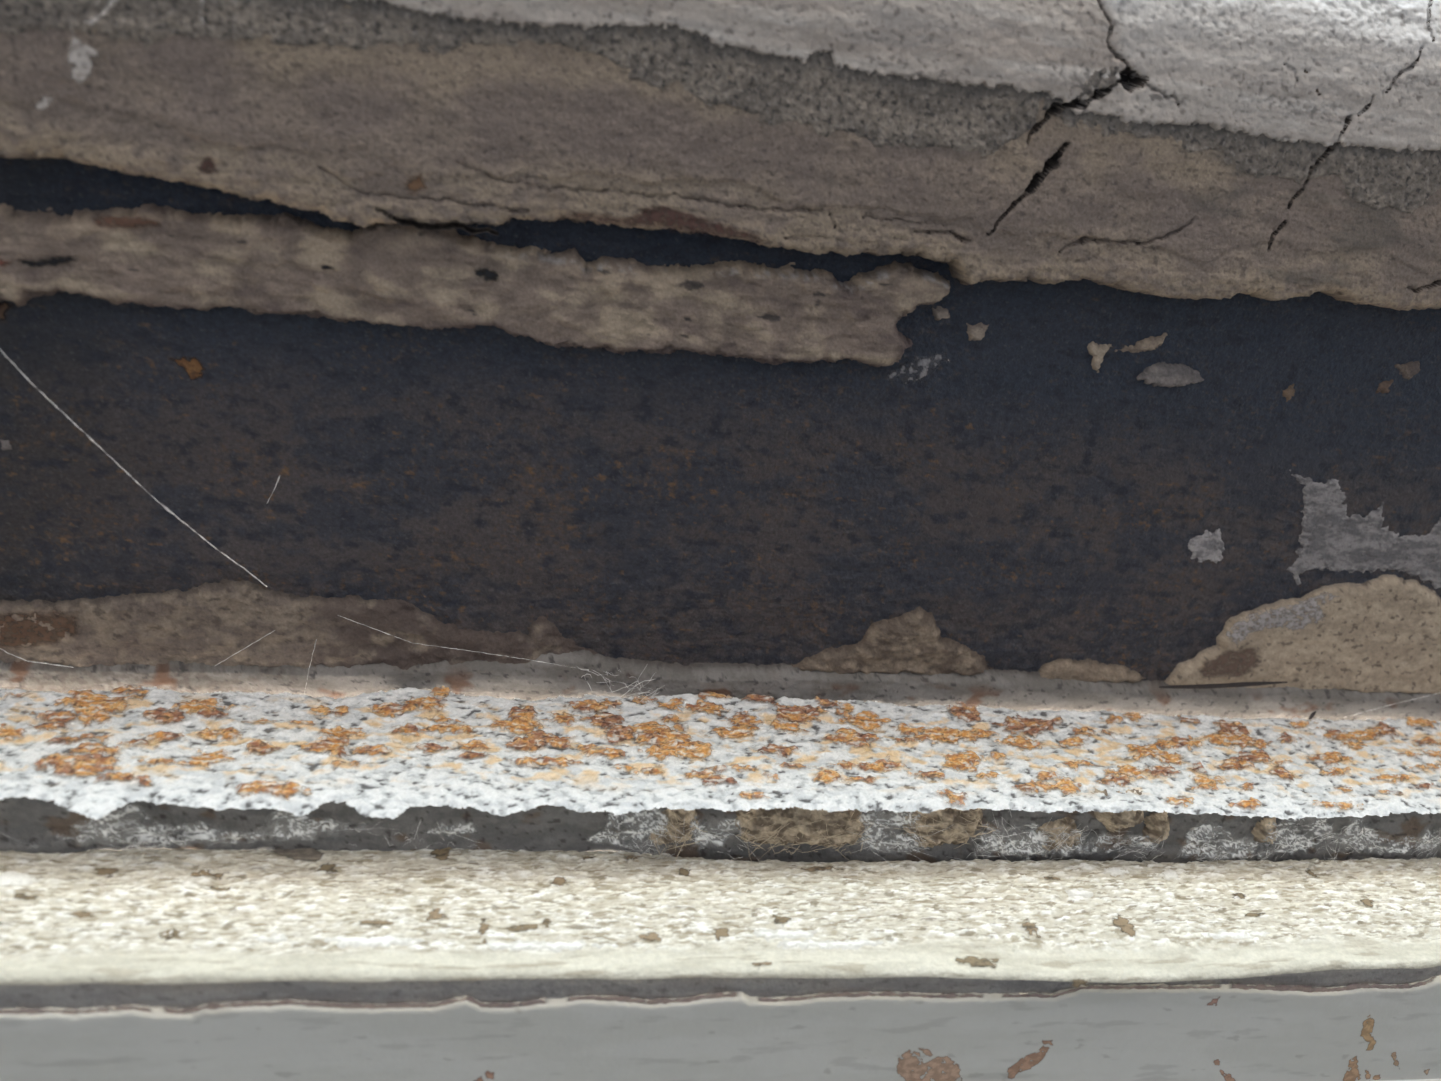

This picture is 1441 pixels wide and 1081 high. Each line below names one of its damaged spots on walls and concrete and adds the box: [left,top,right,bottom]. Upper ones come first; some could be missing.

crack [320,0,1180,243]
crack [1268,0,1435,250]
spalling [22,256,73,267]
spalling [475,268,499,281]
rust [0,685,1441,809]